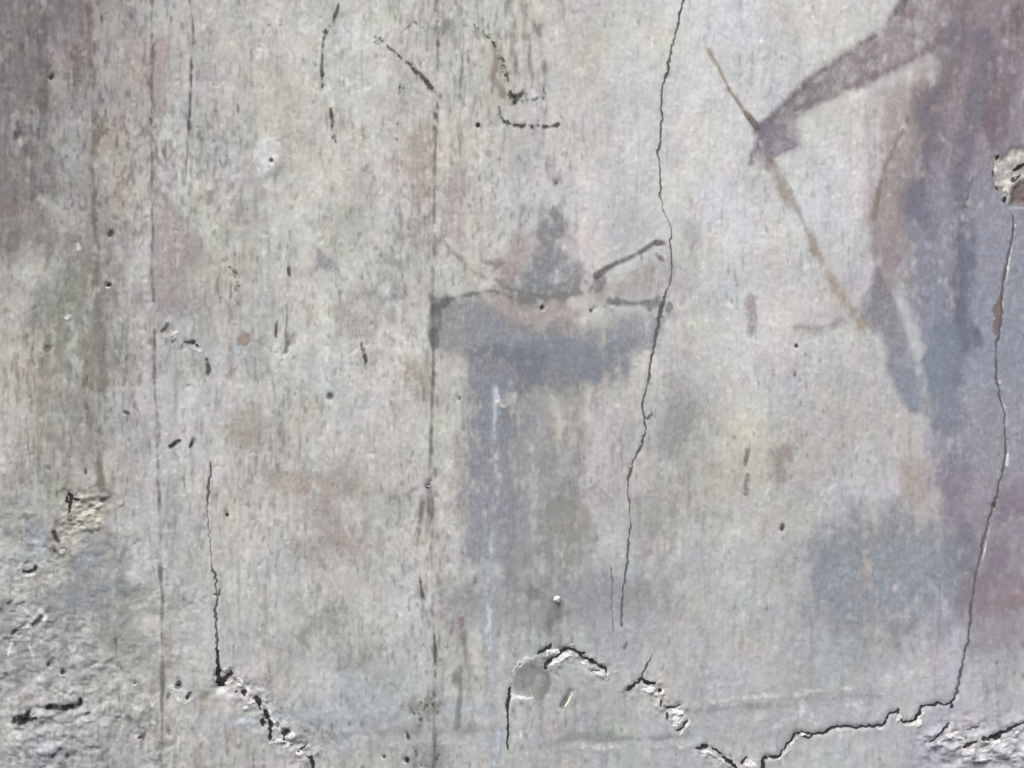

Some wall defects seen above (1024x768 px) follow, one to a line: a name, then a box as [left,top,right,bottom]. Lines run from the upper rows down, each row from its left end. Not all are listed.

flaking render [992,149,1024,206]
crack [505,0,1024,768]
crack [206,461,315,768]
flaking render [510,655,549,700]
flaking render [917,719,1024,768]